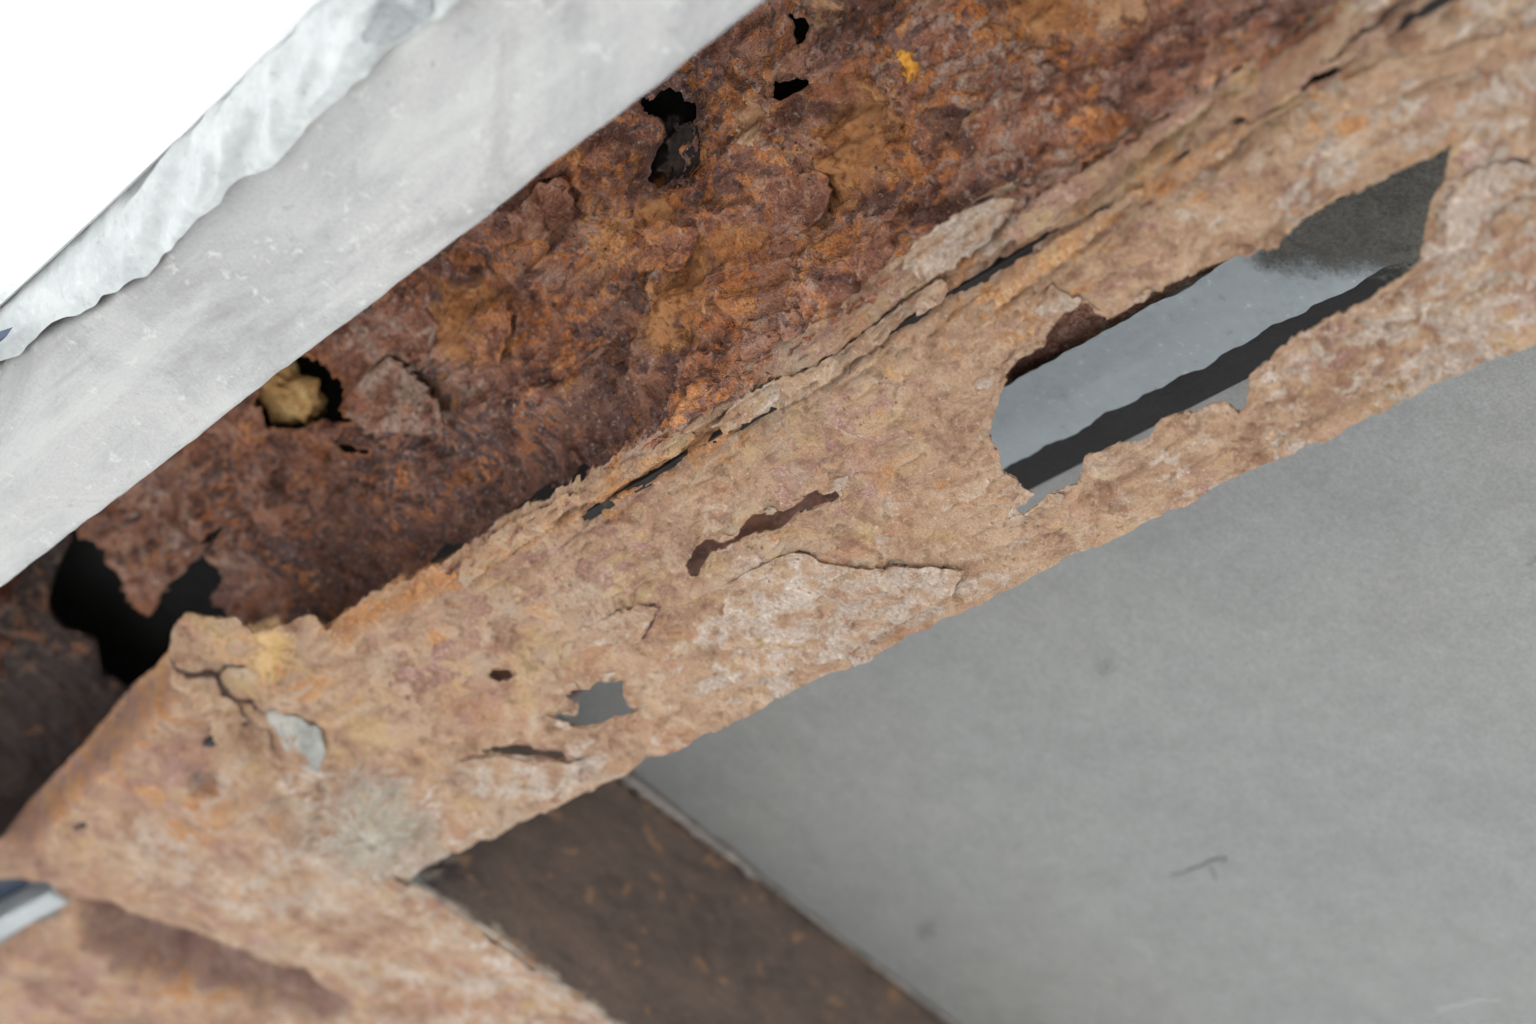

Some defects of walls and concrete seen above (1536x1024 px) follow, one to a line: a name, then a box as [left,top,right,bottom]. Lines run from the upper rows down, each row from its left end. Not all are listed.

rust [635,116,704,234]
peeling [662,71,690,91]
rust [732,97,764,147]
rust [814,83,903,212]
rust [893,49,920,83]
rust [1007,0,1151,51]
rust [639,224,769,358]
peeling [457,91,1306,588]
rust [564,446,687,521]
rust [320,540,485,649]
rust [250,620,290,683]
crack [169,657,282,760]